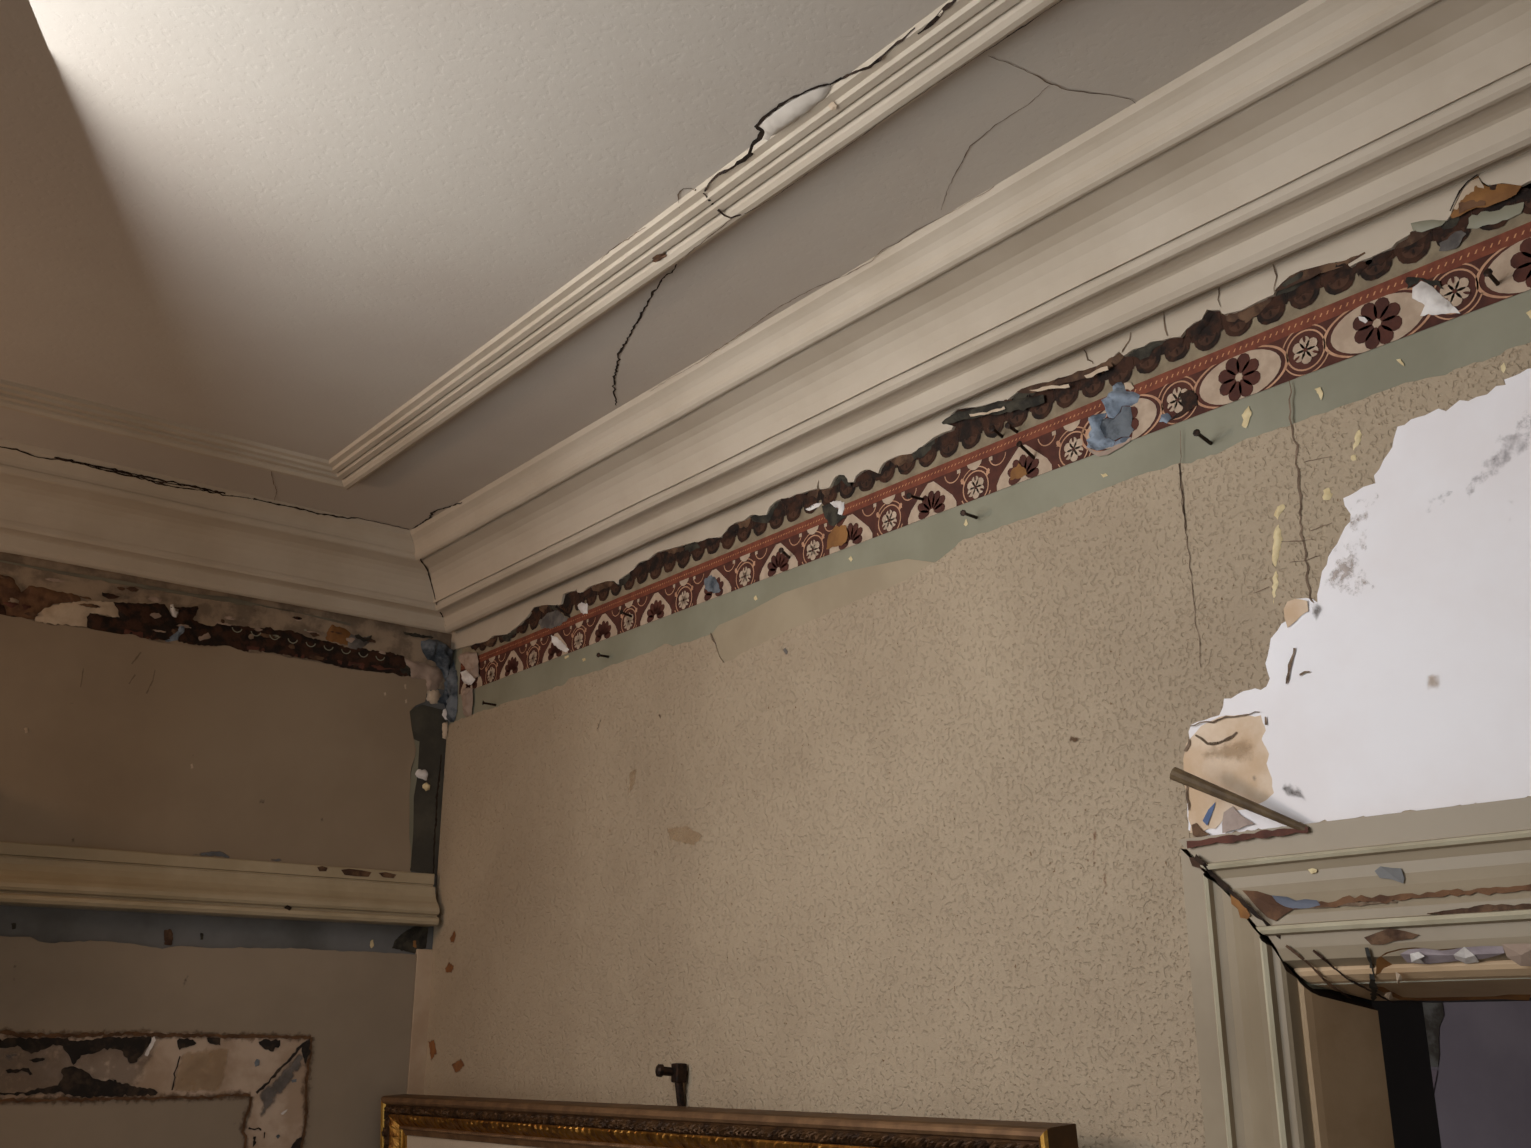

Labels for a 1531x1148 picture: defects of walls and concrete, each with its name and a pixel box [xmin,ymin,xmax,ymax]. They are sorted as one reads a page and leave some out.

crack [612,0,1135,405]
crack [0,446,446,626]
crack [1178,431,1201,667]
peeling [1242,406,1252,428]
crack [1254,381,1331,603]
flaking render [0,552,479,739]
peeling [1273,896,1320,909]
peeling [1376,943,1531,1087]